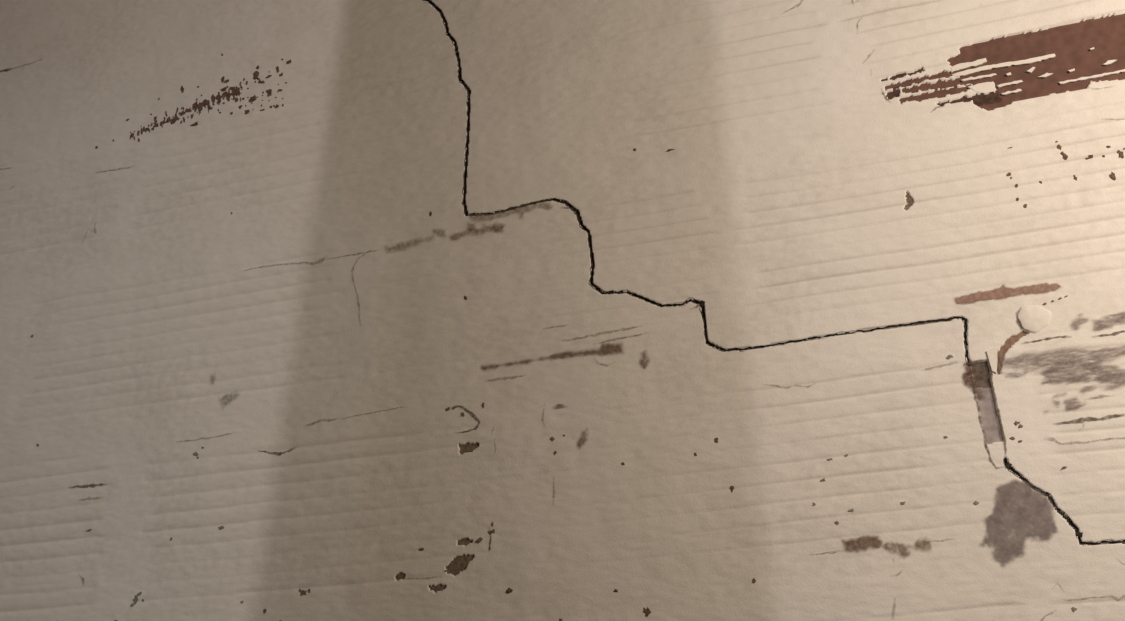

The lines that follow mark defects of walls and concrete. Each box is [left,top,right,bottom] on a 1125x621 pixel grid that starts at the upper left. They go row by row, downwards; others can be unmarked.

crack [425,0,972,366]
peeling [956,283,1068,468]
crack [1004,458,1125,545]